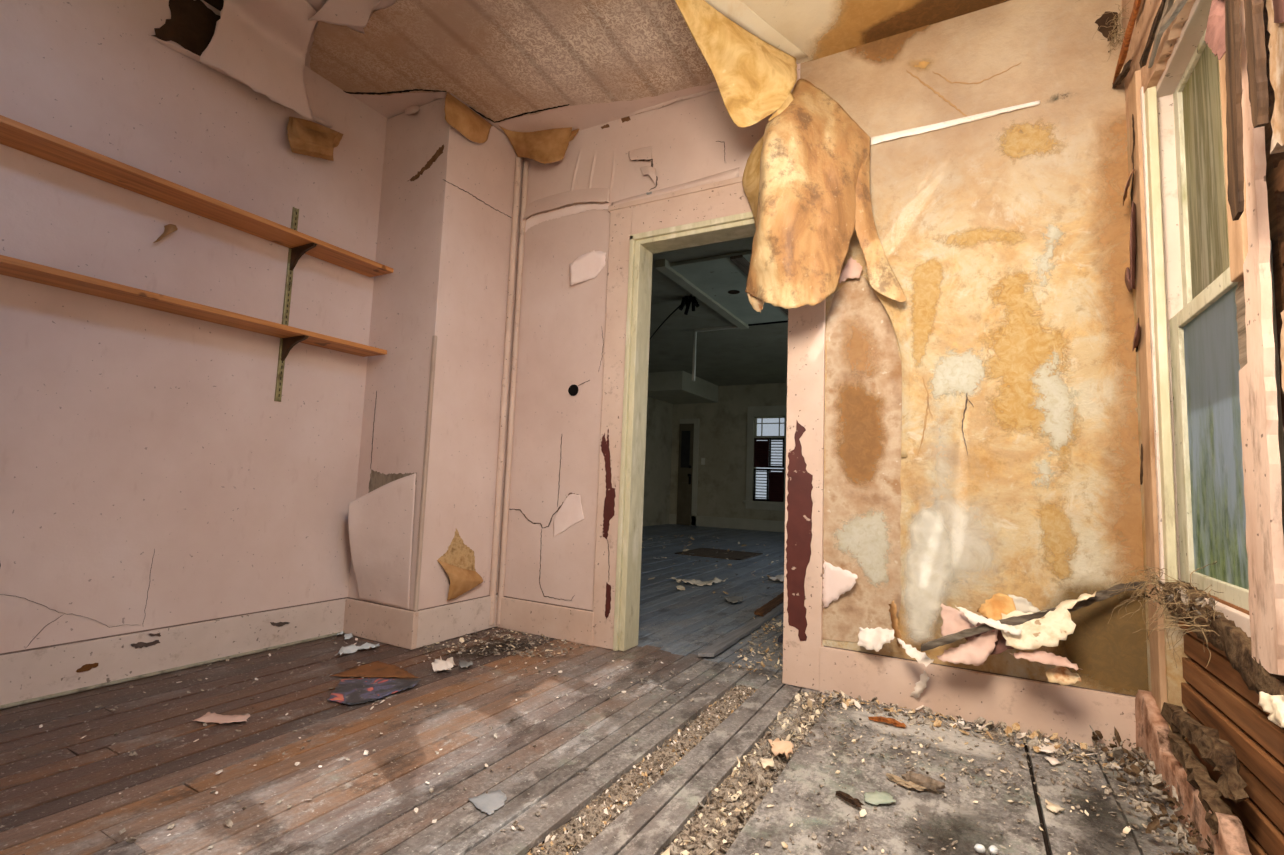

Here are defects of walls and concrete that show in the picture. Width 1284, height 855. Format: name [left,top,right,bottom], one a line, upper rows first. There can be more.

leakage [812,0,1009,63]
leakage [906,61,1020,117]
leakage [837,323,884,486]
crack [0,549,155,646]
flaking render [368,469,417,493]
flaking render [438,529,476,571]
crack [509,437,579,601]
peeling [600,429,616,539]
flaking render [786,276,902,643]